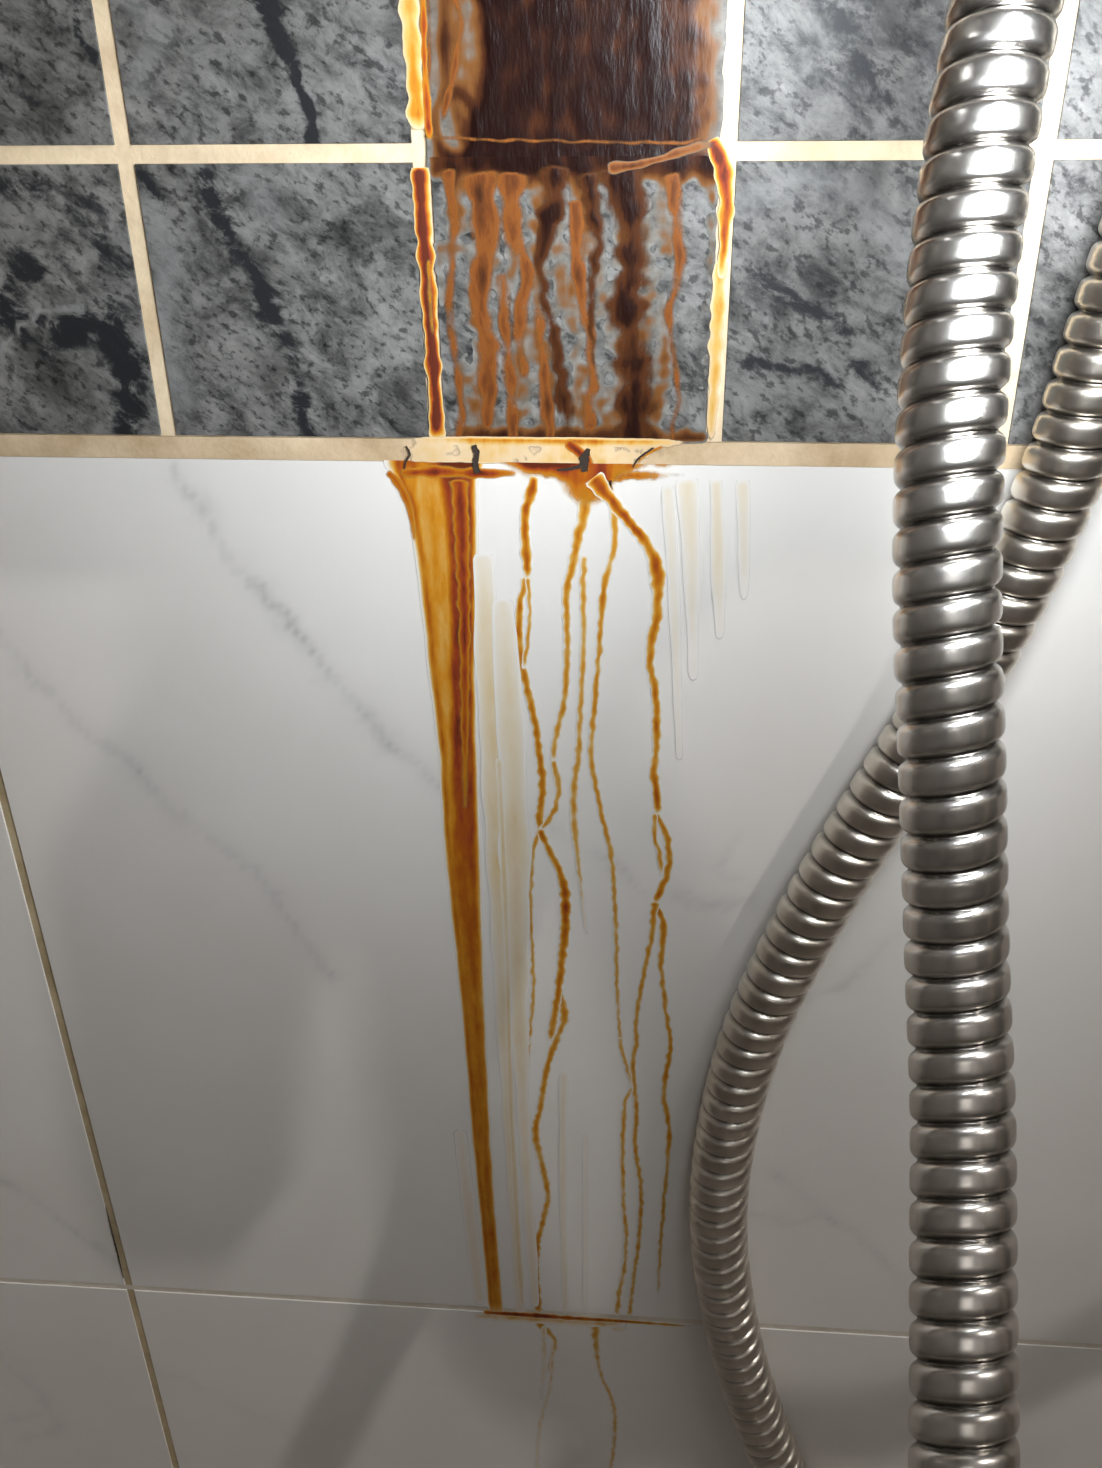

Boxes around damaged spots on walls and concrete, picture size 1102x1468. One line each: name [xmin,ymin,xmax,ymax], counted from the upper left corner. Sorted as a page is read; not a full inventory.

rust [384,0,735,1468]